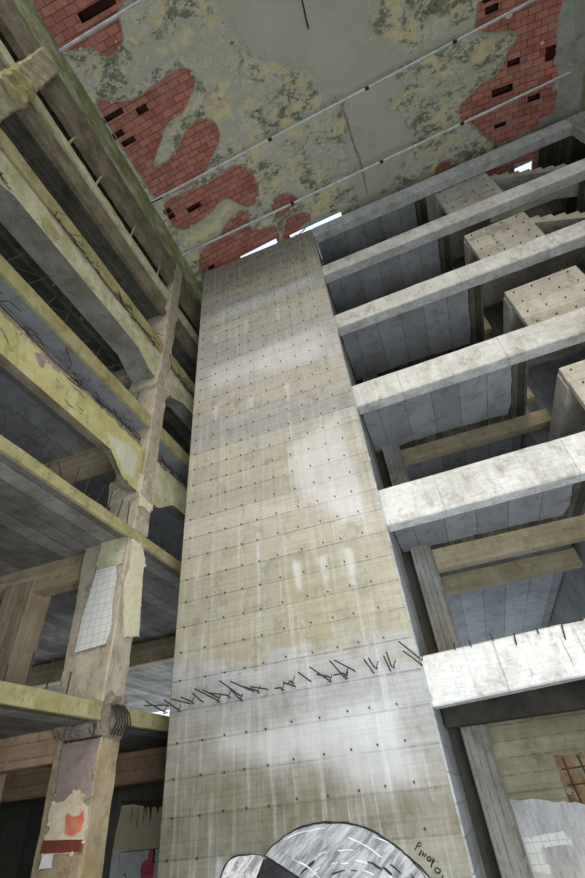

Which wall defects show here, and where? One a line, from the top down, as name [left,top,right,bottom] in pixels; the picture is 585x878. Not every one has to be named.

flaking render [32,0,585,288]
spalling [144,659,356,714]
spalling [363,652,396,674]
peeling [37,703,132,878]
spalling [552,752,585,804]